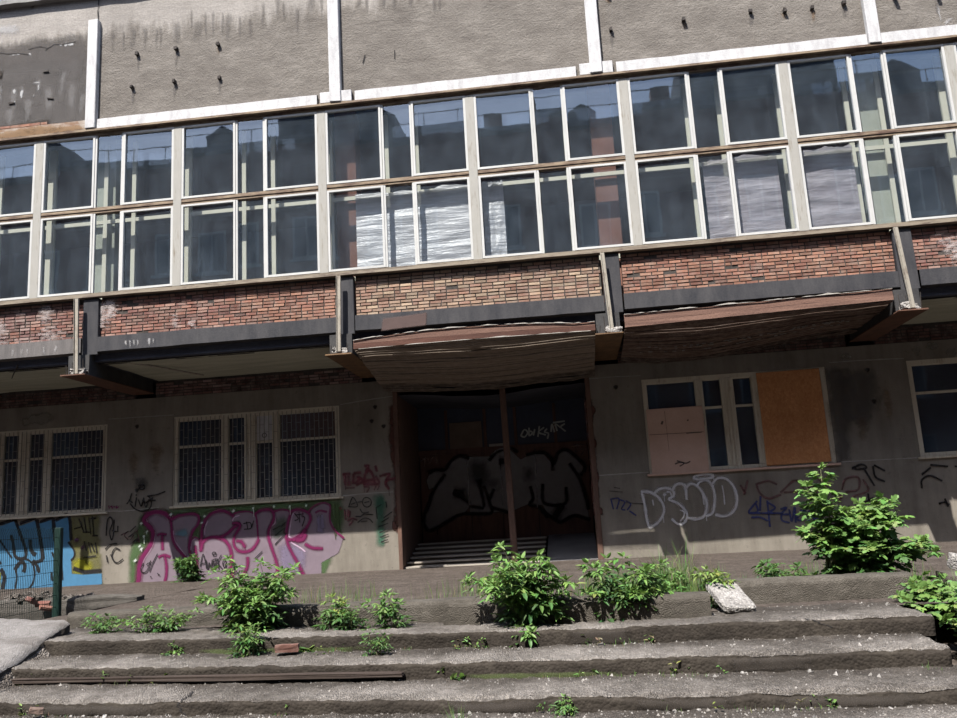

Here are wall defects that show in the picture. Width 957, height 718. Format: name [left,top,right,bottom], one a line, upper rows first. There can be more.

damp [0,36,87,127]